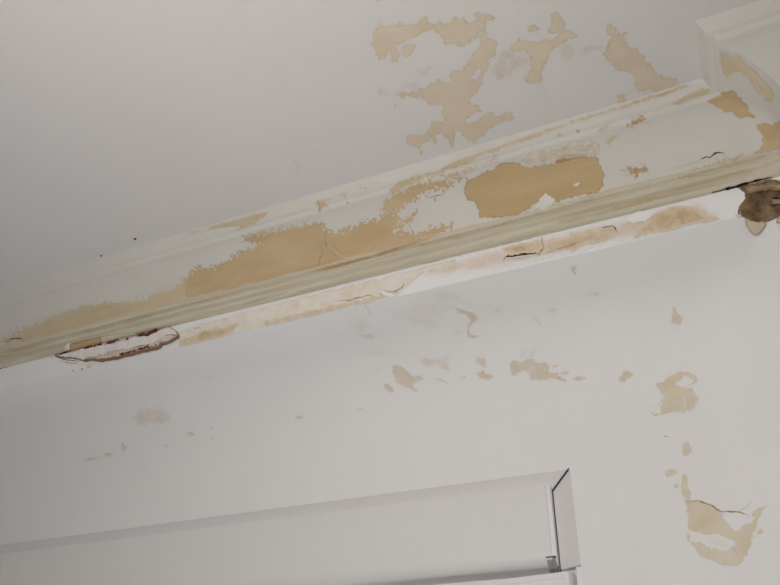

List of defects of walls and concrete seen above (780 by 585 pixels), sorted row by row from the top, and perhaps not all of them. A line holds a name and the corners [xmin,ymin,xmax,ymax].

peeling [370,4,678,155]
peeling [706,89,756,119]
peeling [719,52,774,103]
damp [0,83,780,368]
peeling [463,155,606,219]
spalling [735,179,780,235]
peeling [372,354,494,394]
peeling [509,346,587,383]